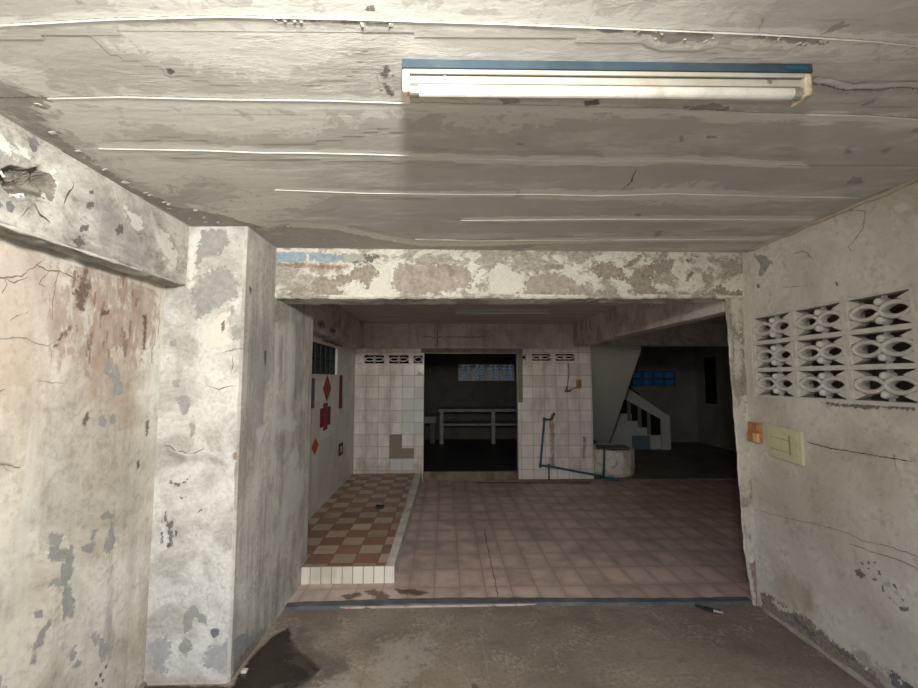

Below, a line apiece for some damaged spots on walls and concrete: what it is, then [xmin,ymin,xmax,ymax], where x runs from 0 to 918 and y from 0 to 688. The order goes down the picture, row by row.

crack [812,77,918,91]
peeling [0,71,743,353]
crack [0,261,84,317]
crack [1,315,60,384]
peeling [170,378,199,439]
crack [806,441,912,466]
crack [756,510,918,569]
peeling [28,509,119,678]
damp [126,670,227,688]
peeling [145,601,271,681]
damp [257,622,359,688]
spalling [748,553,918,688]